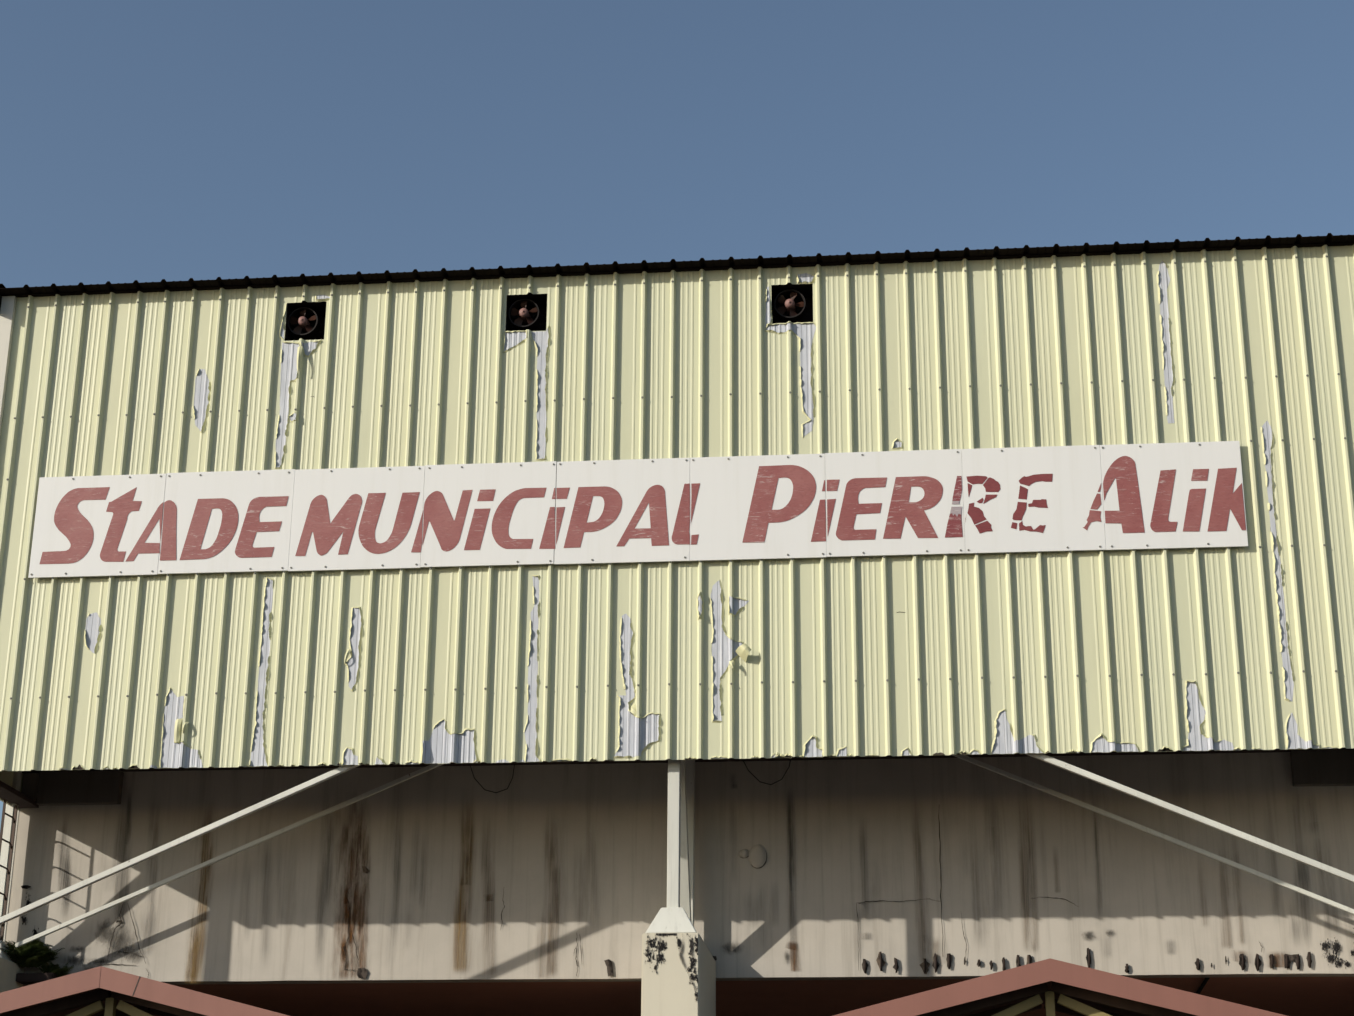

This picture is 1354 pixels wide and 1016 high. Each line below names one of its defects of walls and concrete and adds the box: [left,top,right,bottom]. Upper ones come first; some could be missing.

peeling [274,303,322,469]
peeling [503,326,550,461]
peeling [764,286,816,438]
peeling [1260,421,1337,749]
peeling [103,687,203,769]
peeling [243,577,295,767]
peeling [318,575,572,766]
peeling [933,709,1049,755]
peeling [1066,733,1139,753]
peeling [1158,680,1263,751]
leakage [68,923,139,970]
rust [338,828,368,976]